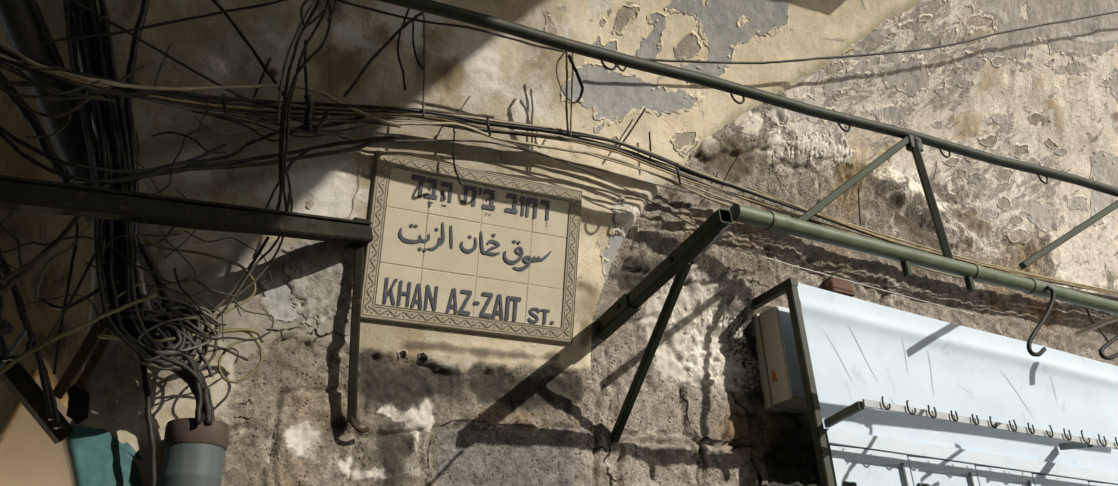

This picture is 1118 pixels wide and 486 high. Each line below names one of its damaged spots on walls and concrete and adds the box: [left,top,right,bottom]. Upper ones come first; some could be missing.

flaking render [560,0,792,148]
flaking render [766,0,1118,126]
flaking render [979,113,1008,147]
flaking render [1028,111,1067,157]
flaking render [942,143,1118,244]
leakage [406,342,530,357]
leakage [338,367,435,486]
crack [679,389,763,486]